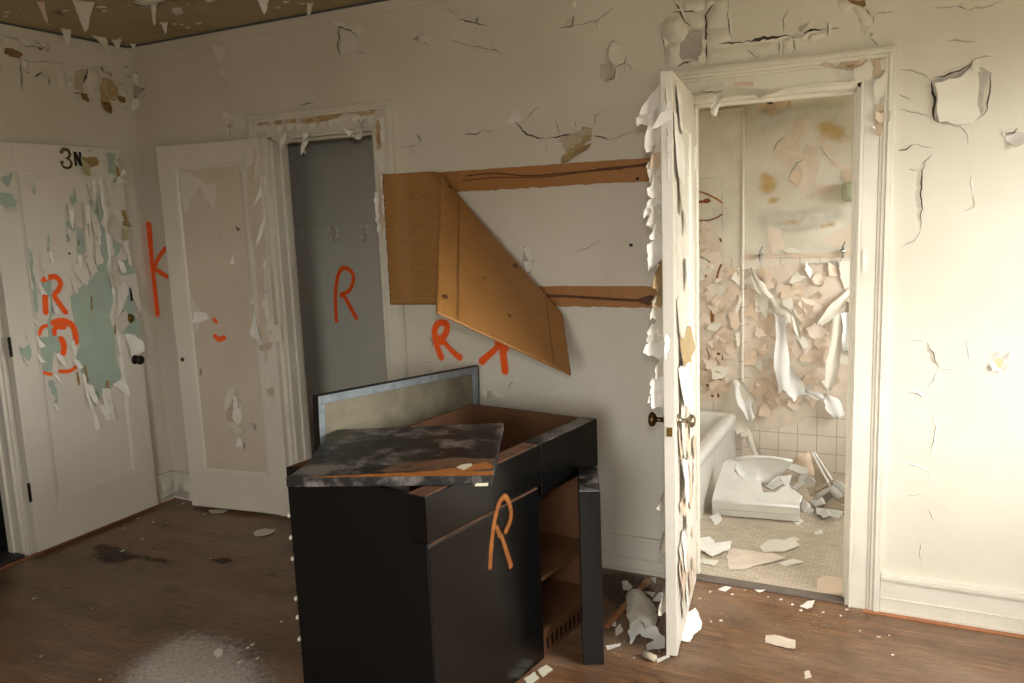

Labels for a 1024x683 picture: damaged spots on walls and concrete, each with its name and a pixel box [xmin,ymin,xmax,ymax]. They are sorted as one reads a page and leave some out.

peeling [60,0,137,52]
crack [413,1,501,54]
crack [559,1,614,28]
flaking render [659,0,734,68]
peeling [1,43,146,114]
crack [464,104,633,164]
peeling [255,109,387,246]
crack [898,143,931,248]
crack [965,175,975,211]
peeling [19,149,145,430]
peeling [636,81,853,642]
crack [899,338,988,561]